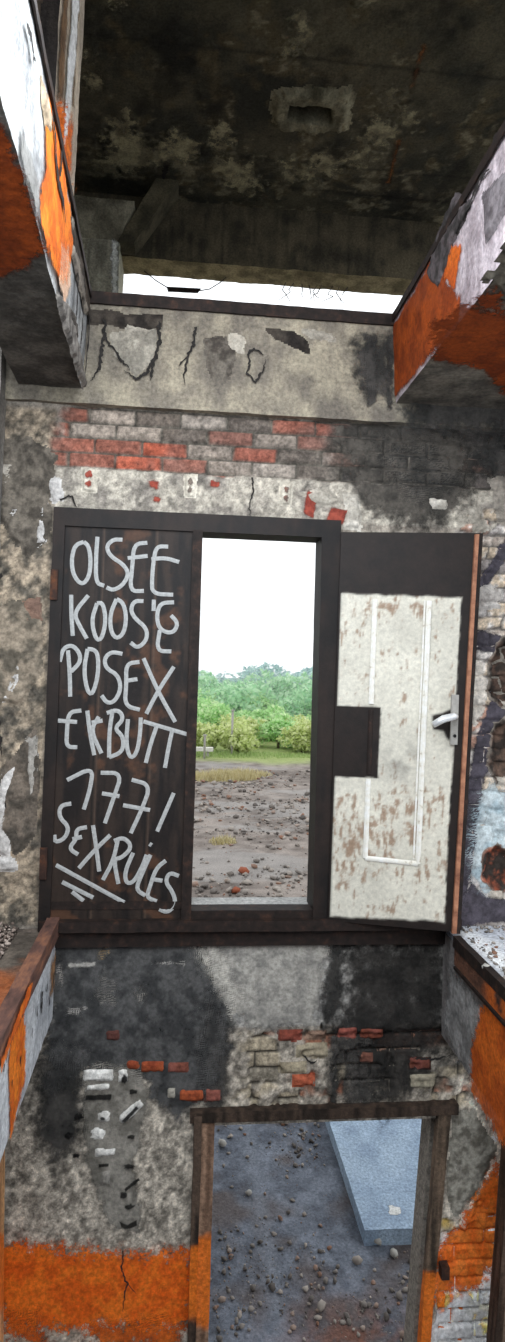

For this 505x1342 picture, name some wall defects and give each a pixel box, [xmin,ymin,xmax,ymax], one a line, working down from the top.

crack [52,110,66,222]
spalling [268,84,418,184]
crack [76,257,197,385]
crack [246,348,266,383]
spalling [278,481,347,524]
peeling [429,498,448,509]
spalling [472,635,505,788]
peeling [0,728,41,872]
spalling [480,842,505,899]
leakage [56,947,117,1014]
leakage [195,1001,235,1108]
leakage [34,1053,86,1170]